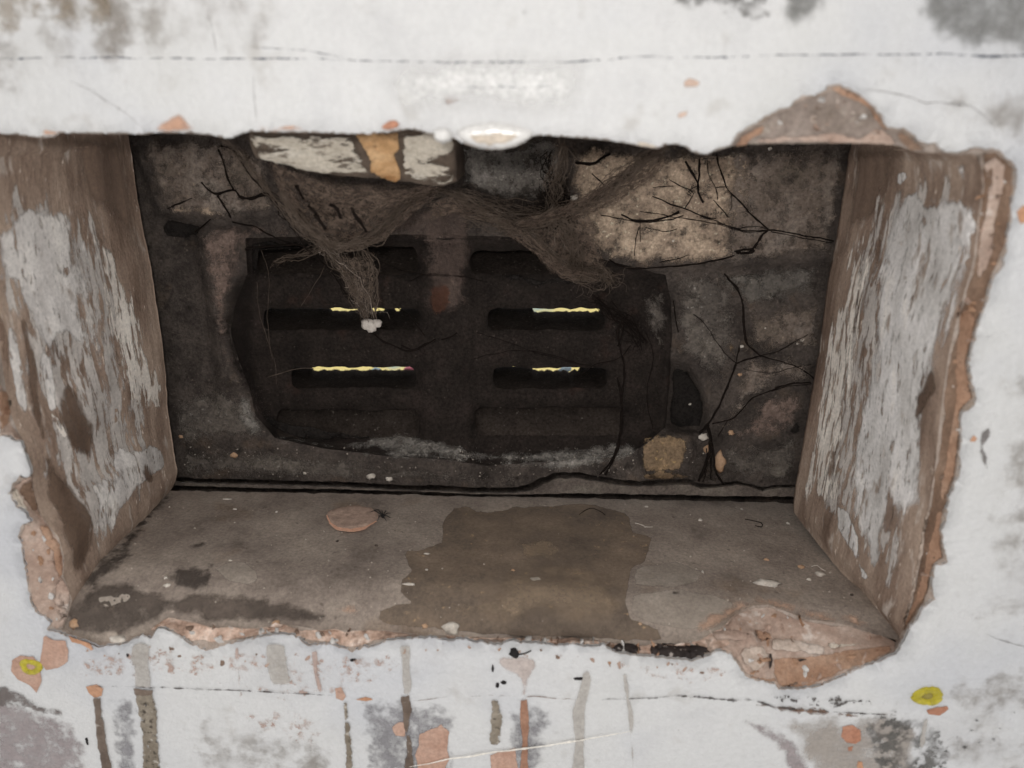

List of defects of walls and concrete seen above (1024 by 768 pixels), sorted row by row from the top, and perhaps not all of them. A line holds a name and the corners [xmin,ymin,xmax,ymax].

leakage [929,0,1024,42]
peeling [251,120,454,184]
peeling [471,133,517,146]
spalling [733,86,925,152]
peeling [804,153,1024,630]
peeling [0,185,164,692]
spalling [326,505,378,532]
leakage [379,504,732,641]
leakage [70,584,324,634]
spalling [151,617,417,647]
spalling [425,607,895,688]